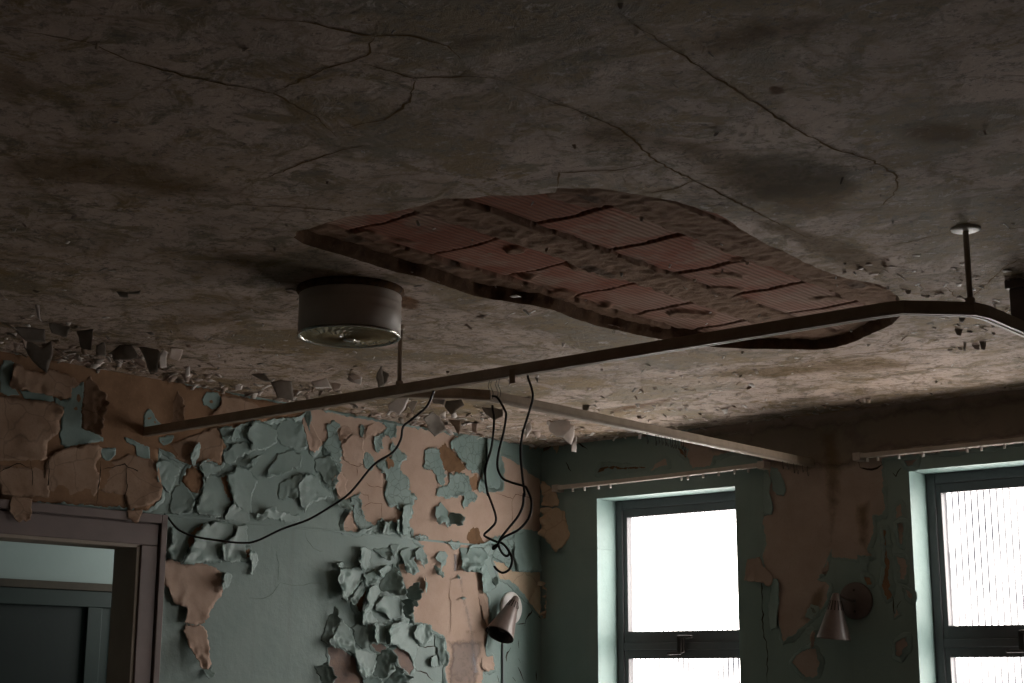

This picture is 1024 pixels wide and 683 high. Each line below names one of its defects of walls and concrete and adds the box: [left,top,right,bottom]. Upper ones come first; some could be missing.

crack [0,18,810,239]
crack [619,13,899,218]
rust [401,296,419,309]
spalling [285,224,712,340]
peeling [835,260,1024,301]
peeling [0,291,1024,683]